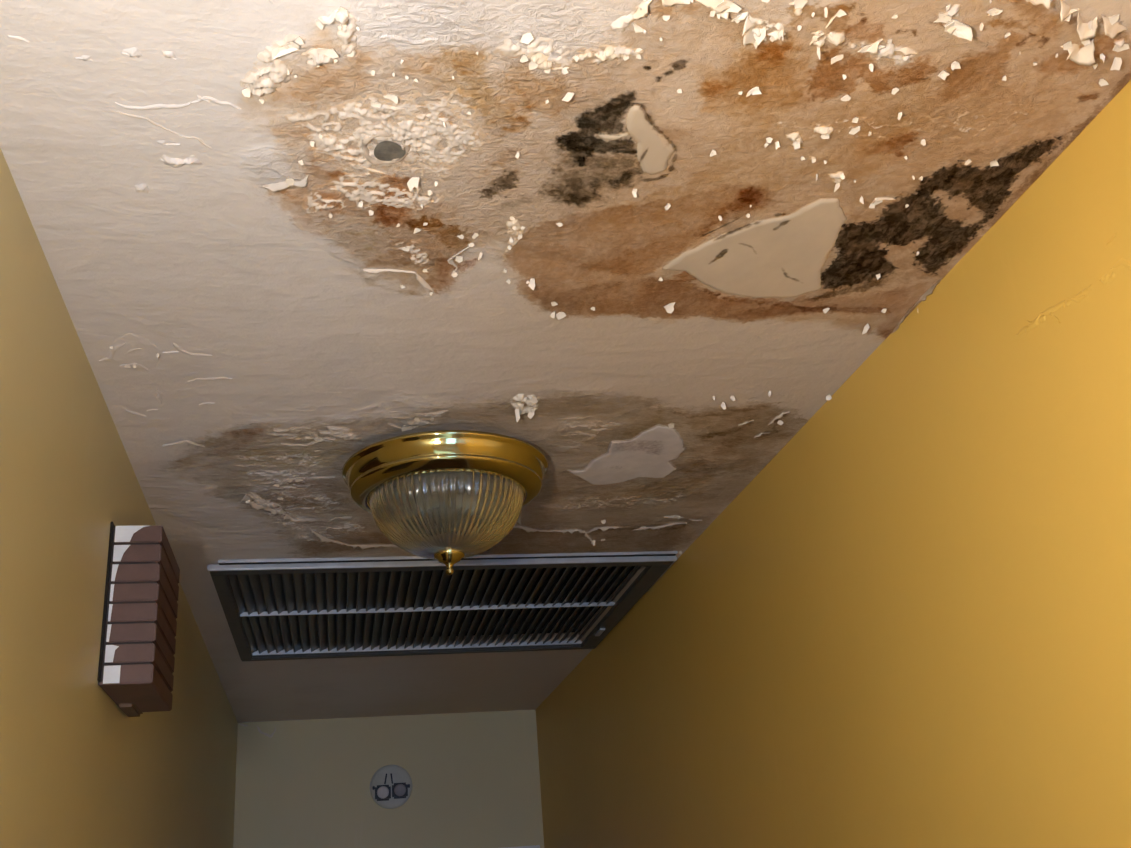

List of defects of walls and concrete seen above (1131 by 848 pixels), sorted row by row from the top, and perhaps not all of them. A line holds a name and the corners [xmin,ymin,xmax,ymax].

peeling [240,6,360,104]
peeling [263,59,495,296]
mould [483,172,517,197]
mould [558,93,637,203]
flaking render [597,103,676,179]
peeling [493,0,918,74]
peeling [738,87,762,97]
flaking render [658,95,1034,298]
damp [820,137,1061,334]
peeling [933,0,1003,41]
peeling [1026,0,1130,86]
flaking render [513,396,736,546]